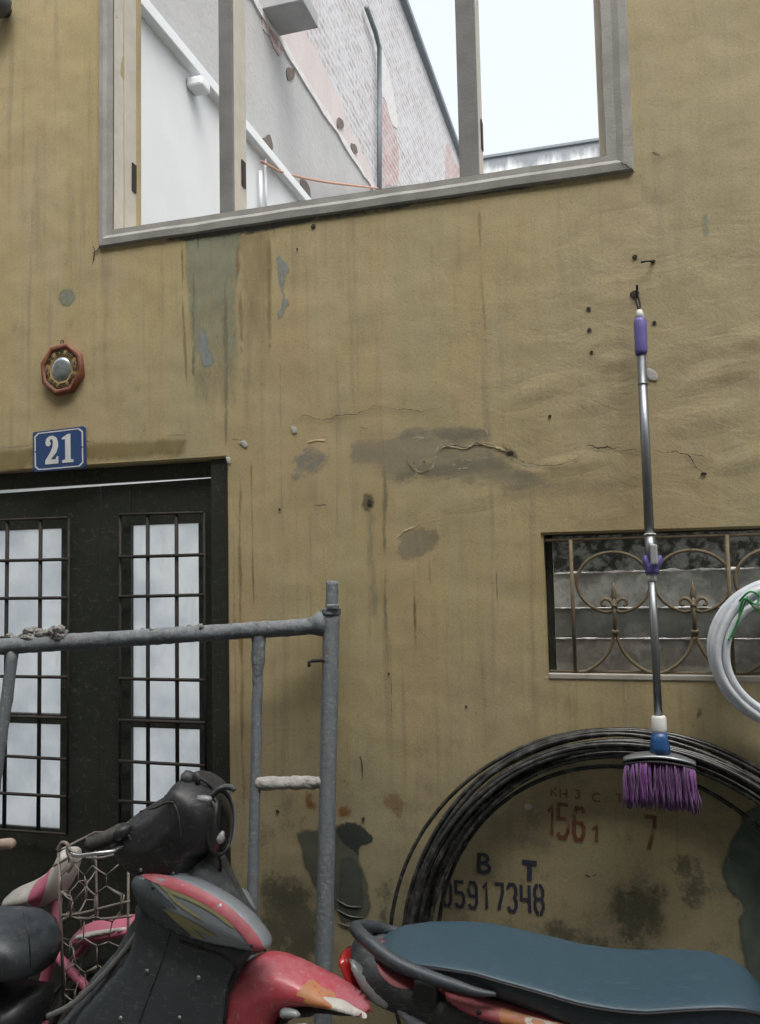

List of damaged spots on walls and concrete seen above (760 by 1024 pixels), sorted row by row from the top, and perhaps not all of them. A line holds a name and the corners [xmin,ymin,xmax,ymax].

water stain [186,229,240,351]
peeling [277,256,289,317]
crack [439,442,710,475]